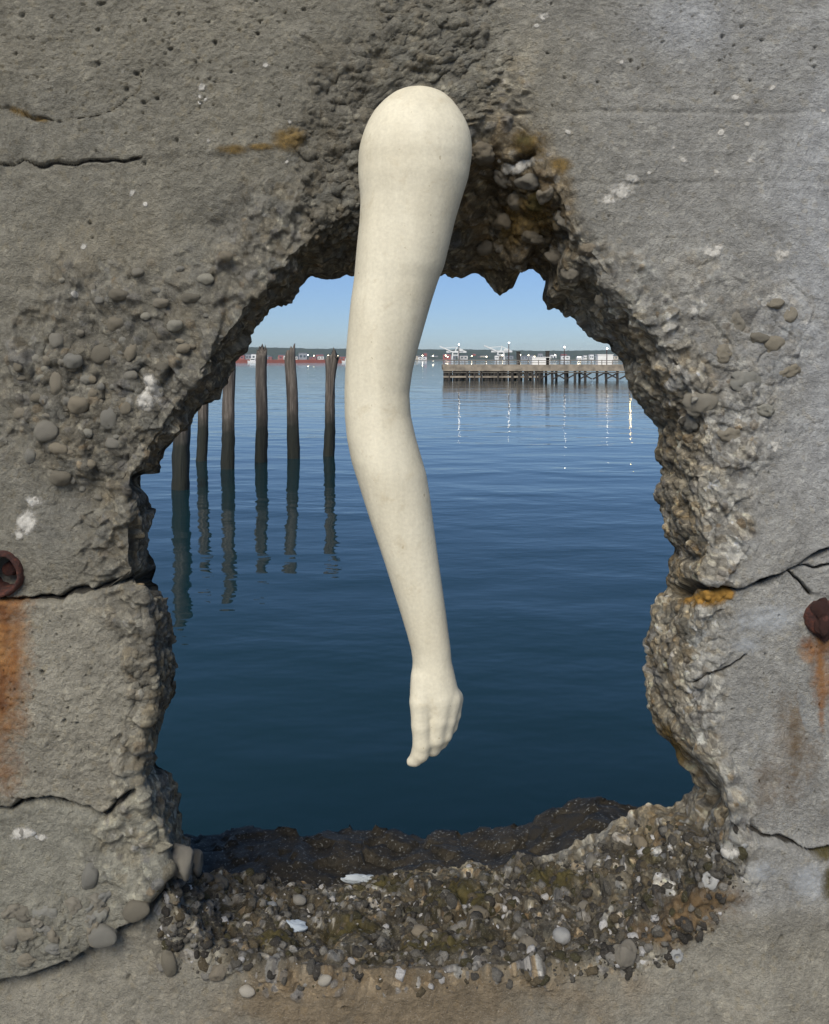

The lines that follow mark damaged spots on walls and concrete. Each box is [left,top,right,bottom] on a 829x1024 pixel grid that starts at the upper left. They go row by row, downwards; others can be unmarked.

spalling [291,0,515,246]
crack [0,157,142,169]
peeling [602,175,638,203]
spalling [471,141,580,284]
crack [6,574,135,600]
spalling [646,378,709,743]
crack [727,547,829,593]
rust [0,596,22,730]
spalling [119,605,178,771]
crack [104,790,131,815]
peeling [719,842,751,860]
crack [746,825,829,851]